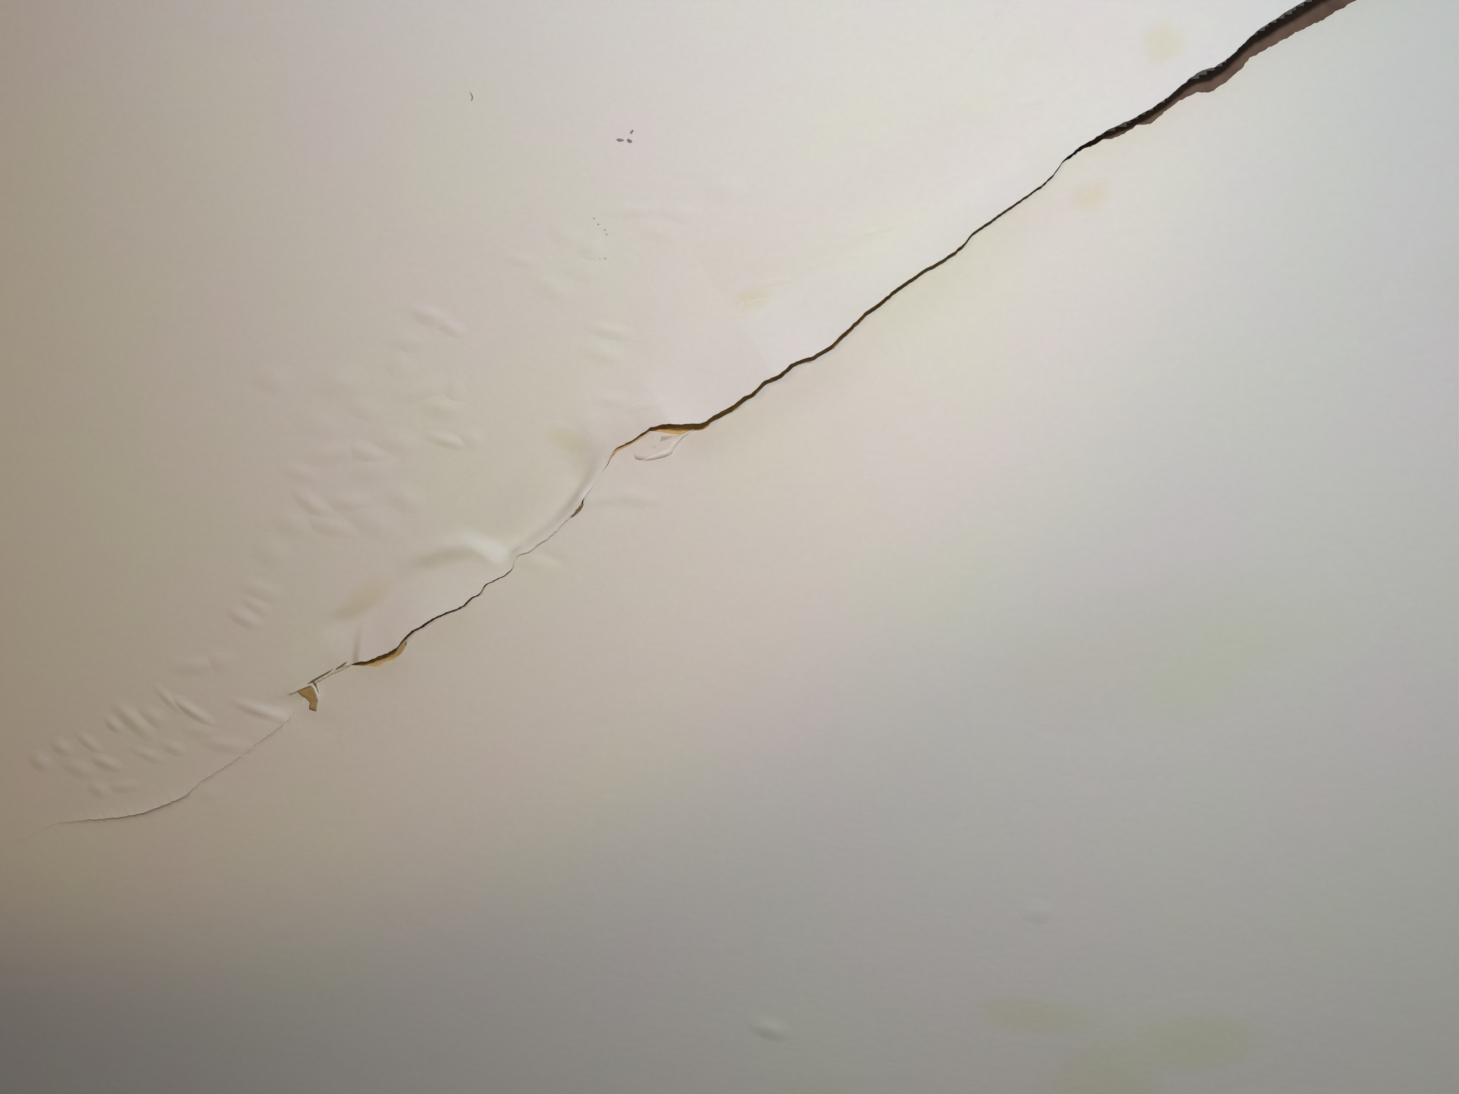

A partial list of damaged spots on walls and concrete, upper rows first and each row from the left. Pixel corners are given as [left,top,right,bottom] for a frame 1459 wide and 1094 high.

peeling [551,0,1306,463]
peeling [257,503,491,717]